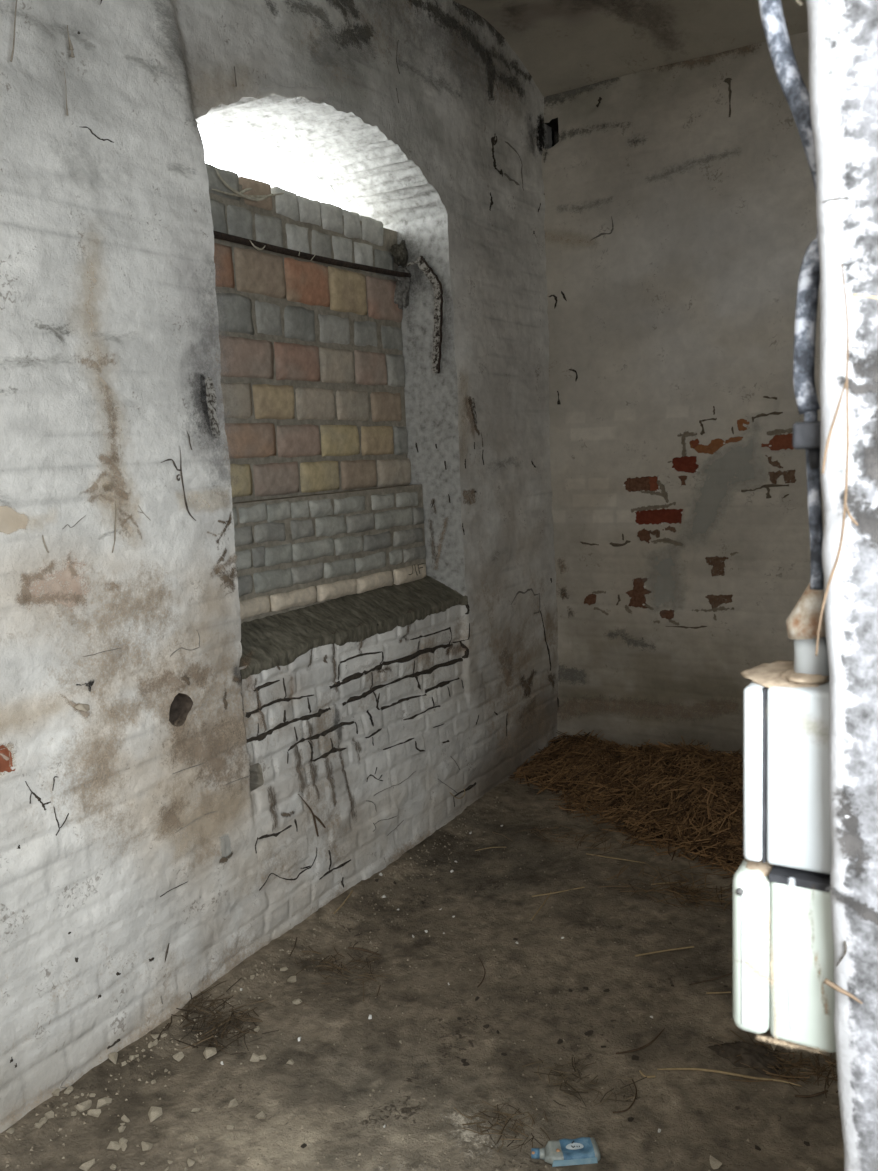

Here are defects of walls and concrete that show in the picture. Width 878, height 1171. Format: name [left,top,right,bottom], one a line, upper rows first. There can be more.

damp [267,0,374,49]
damp [82,355,142,539]
spalling [668,419,750,486]
spalling [761,428,796,484]
spalling [623,476,683,546]
damp [17,557,88,607]
damp [208,515,237,592]
spalling [625,578,679,625]
spalling [692,594,734,620]
damp [223,667,267,732]
spalling [0,744,16,775]
crack [367,757,460,836]